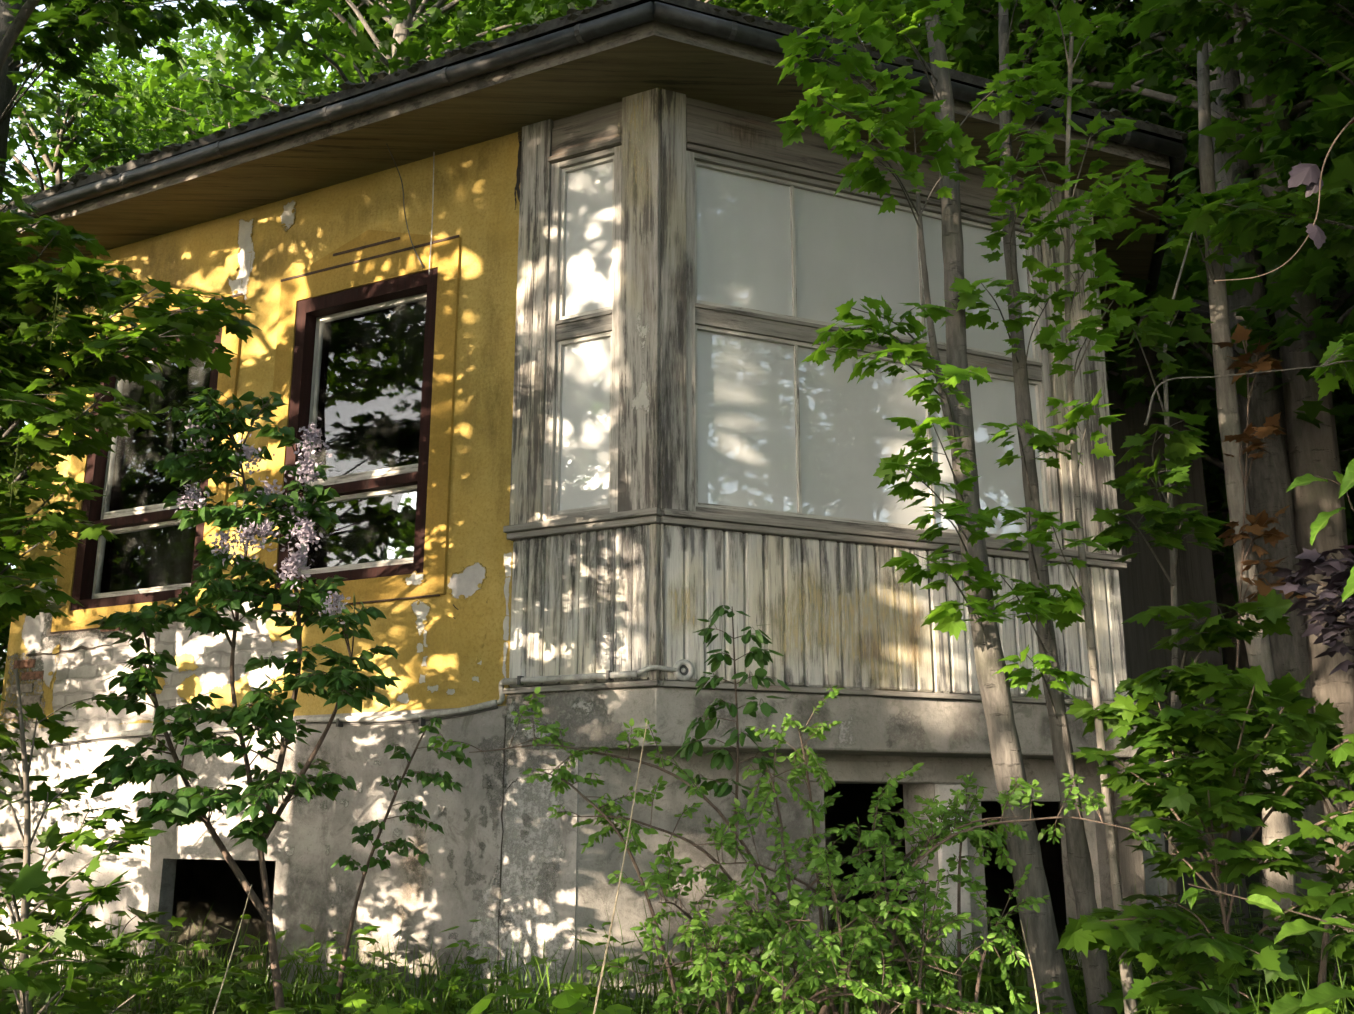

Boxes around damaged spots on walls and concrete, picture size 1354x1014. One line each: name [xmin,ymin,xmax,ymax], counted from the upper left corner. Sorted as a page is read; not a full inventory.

peeling [228,218,255,300]
peeling [447,562,487,600]
damp [665,526,747,569]
damp [764,534,915,591]
damp [1050,562,1114,614]
flaking render [0,578,297,737]
peeling [402,571,455,695]
damp [397,823,423,921]